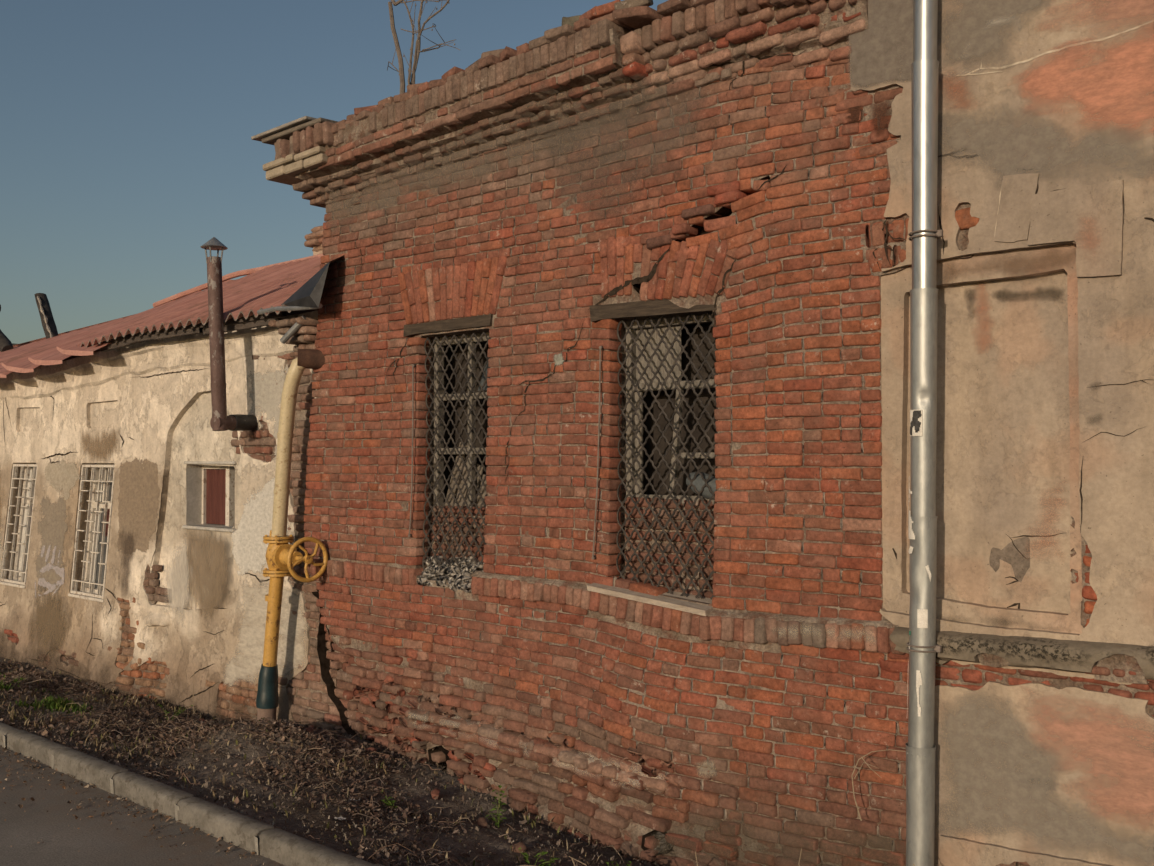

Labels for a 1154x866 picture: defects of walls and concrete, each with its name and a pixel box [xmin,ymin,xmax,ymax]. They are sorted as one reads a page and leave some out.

spalling [815,85,911,276]
spalling [955,203,980,259]
crack [505,165,787,474]
peeling [230,335,307,463]
spalling [57,565,171,702]
leakage [122,535,134,592]
peeling [231,478,275,575]
crack [312,589,364,736]
spalling [278,369,574,785]
spalling [935,653,1154,717]
crack [1005,427,1144,609]
spalling [1071,517,1097,628]